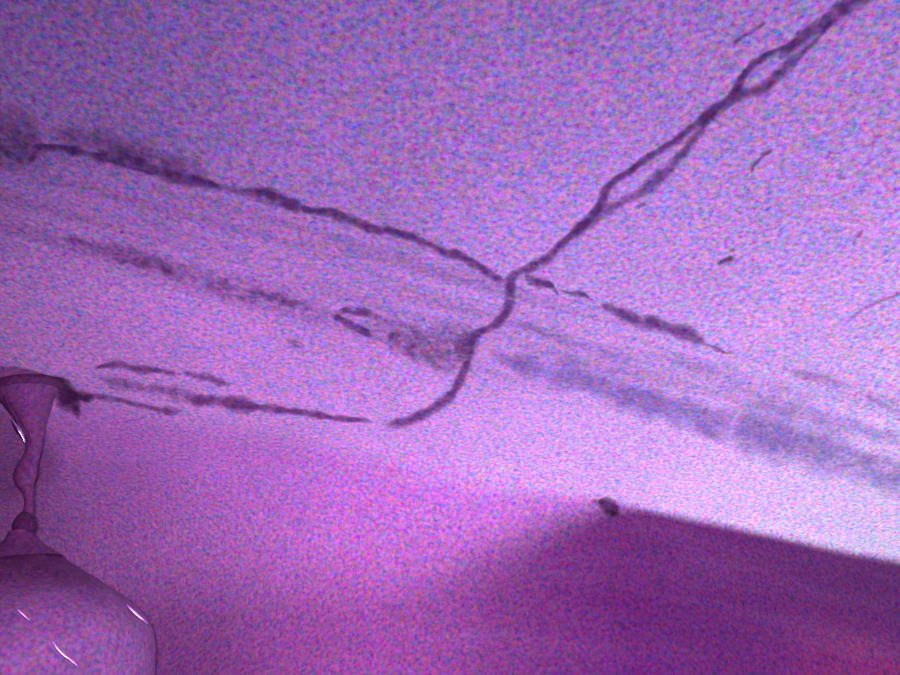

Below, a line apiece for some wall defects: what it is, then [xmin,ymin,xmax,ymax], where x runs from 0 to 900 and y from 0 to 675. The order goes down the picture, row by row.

crack [32,0,869,427]